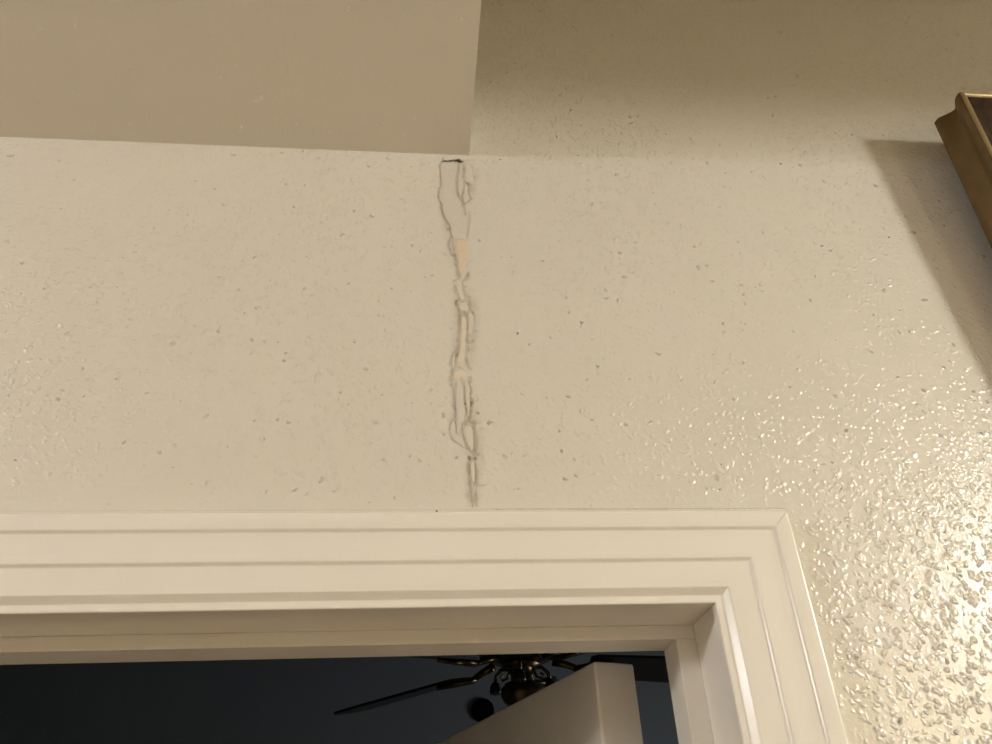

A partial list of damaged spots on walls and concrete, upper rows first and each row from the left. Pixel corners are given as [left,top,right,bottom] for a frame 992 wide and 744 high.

peeling [439,164,475,482]